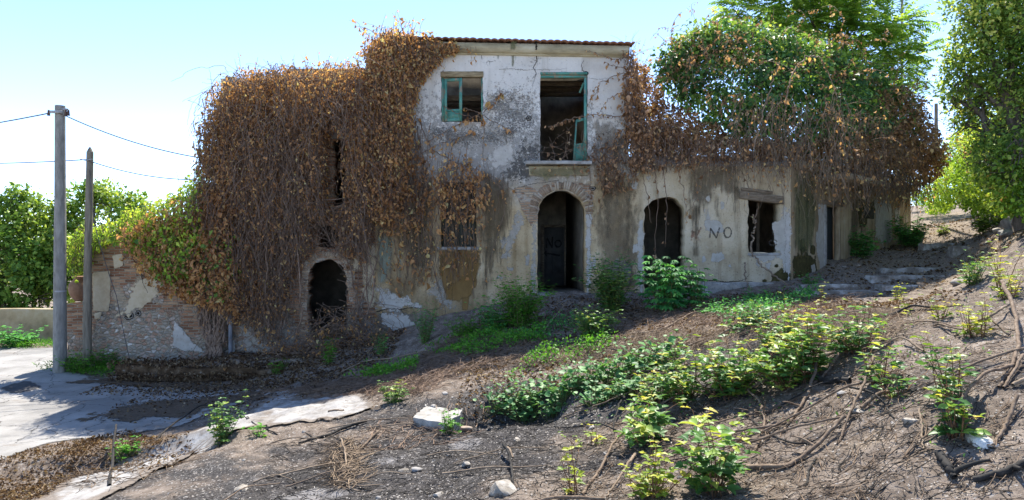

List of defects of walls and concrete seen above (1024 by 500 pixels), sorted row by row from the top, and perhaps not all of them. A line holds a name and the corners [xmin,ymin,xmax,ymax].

damp [442,123,588,281]
damp [794,175,816,254]
peeling [112,254,123,268]
peeling [115,263,165,318]
peeling [238,244,456,353]